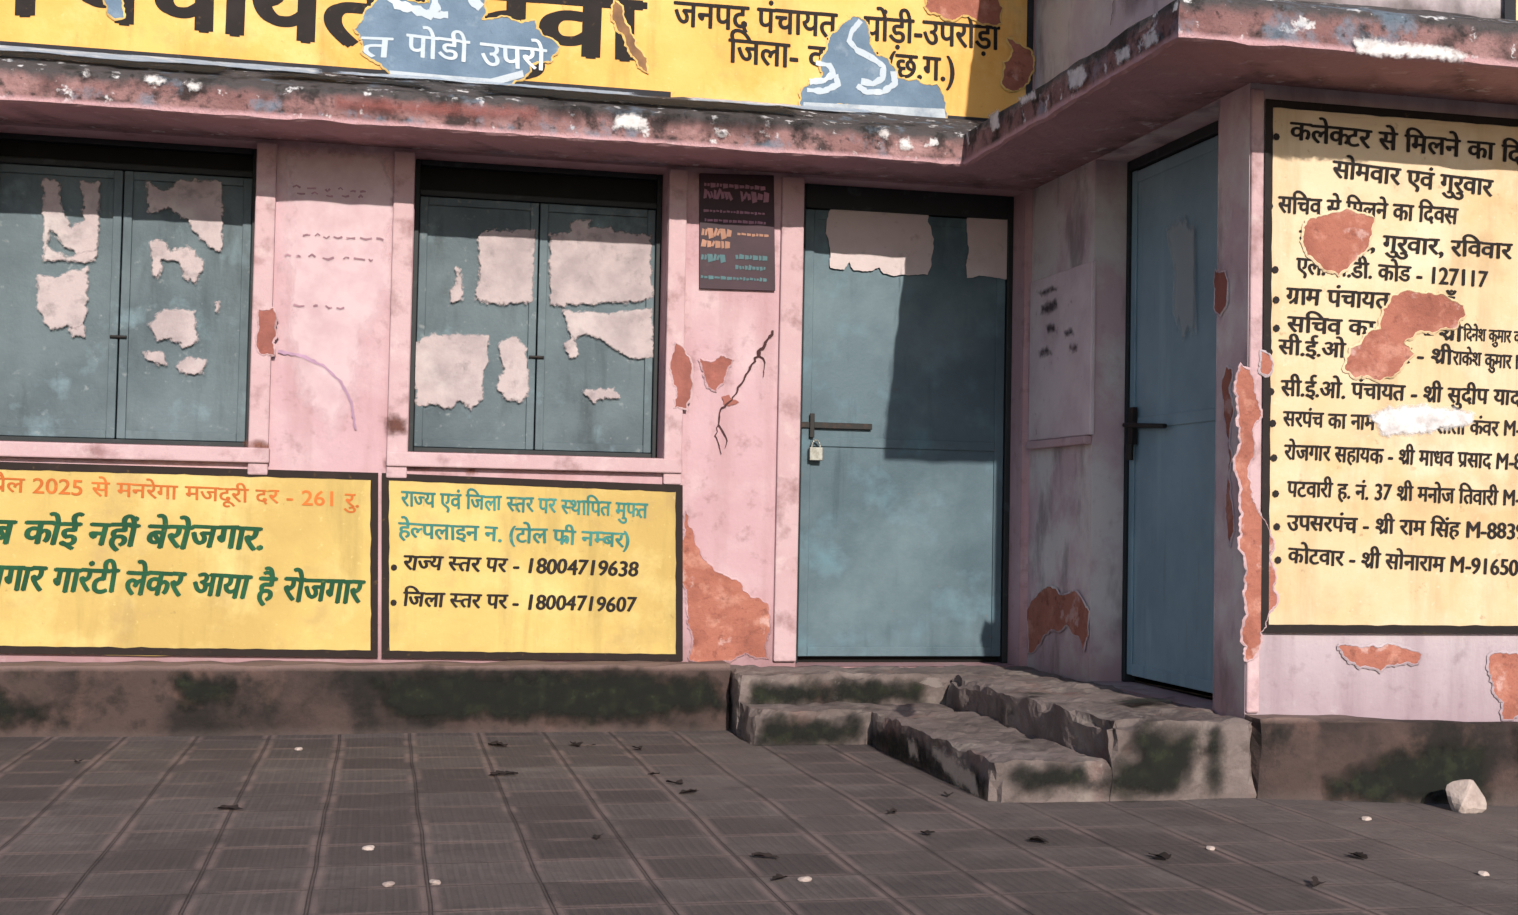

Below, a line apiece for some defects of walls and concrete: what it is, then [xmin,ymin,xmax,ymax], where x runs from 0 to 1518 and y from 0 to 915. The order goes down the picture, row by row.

peeling [353,0,561,85]
peeling [798,15,948,150]
peeling [1300,206,1376,277]
peeling [254,304,344,357]
peeling [668,341,738,411]
crack [714,330,774,453]
peeling [1342,288,1468,384]
peeling [1221,349,1280,663]
peeling [683,510,772,663]
peeling [1027,585,1090,655]
peeling [1337,642,1424,674]
peeling [1486,650,1518,722]